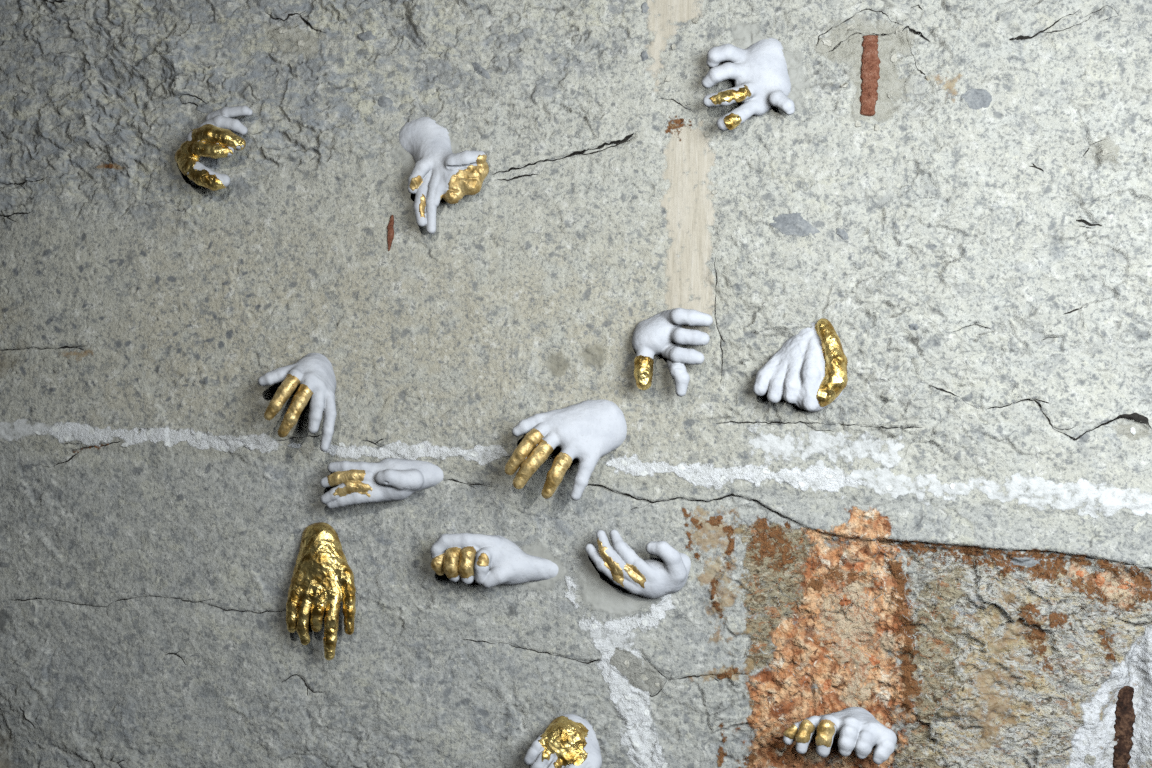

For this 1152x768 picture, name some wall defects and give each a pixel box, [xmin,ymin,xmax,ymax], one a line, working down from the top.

crack [266,11,322,32]
crack [492,133,634,181]
crack [0,178,44,222]
crack [930,385,1122,440]
crack [588,484,841,545]
crack [870,540,1152,570]
flaking render [1006,556,1040,567]
crack [16,595,286,616]
rust [717,506,1152,768]
spalling [1062,625,1152,768]